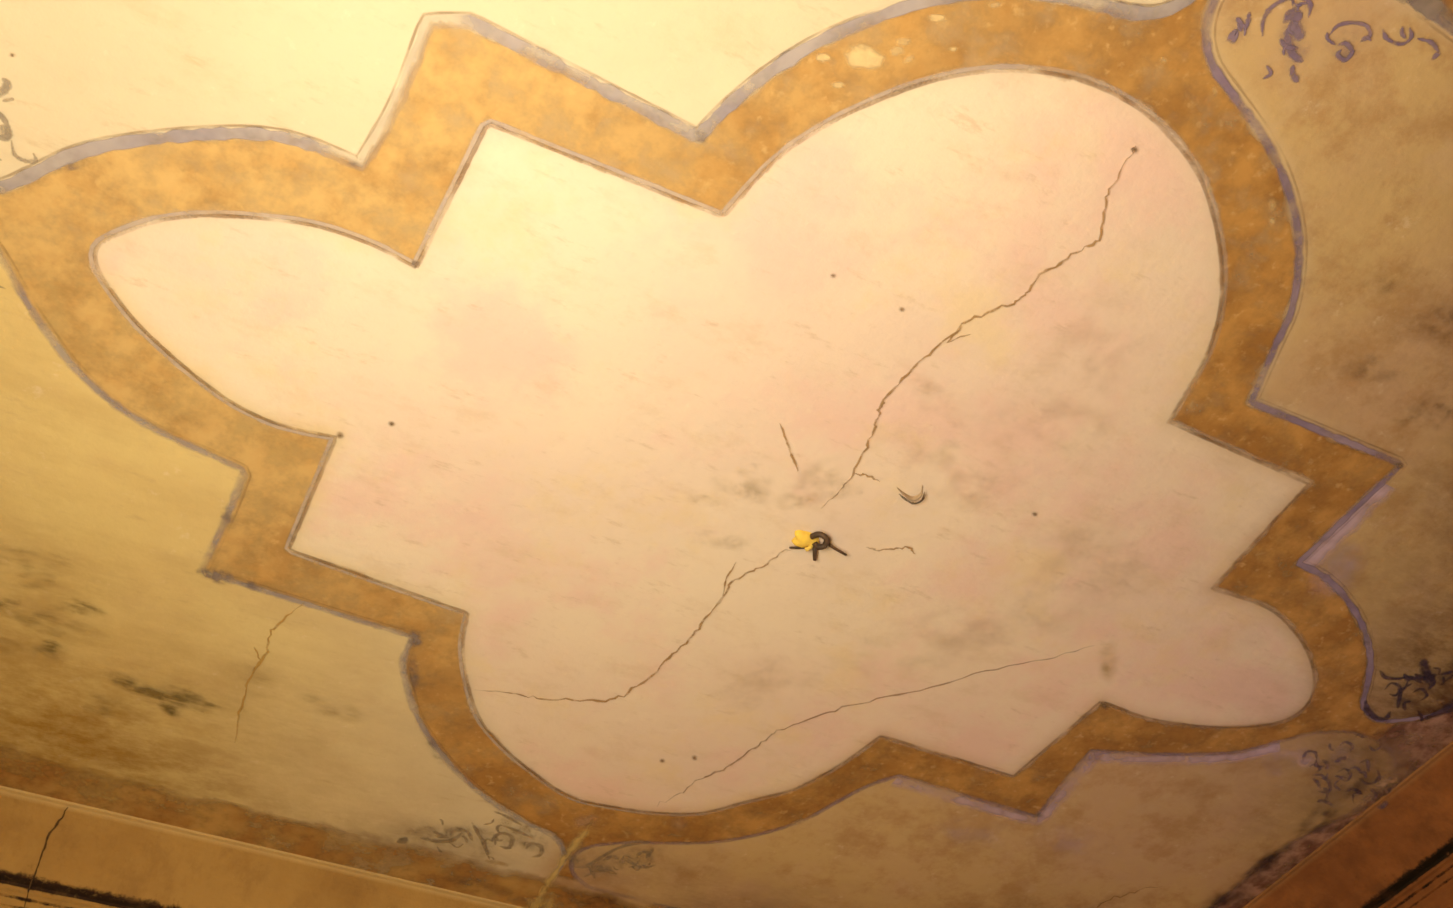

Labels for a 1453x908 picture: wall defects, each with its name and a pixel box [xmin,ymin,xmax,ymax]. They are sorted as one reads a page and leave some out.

crack [832,147,1134,499]
crack [780,424,798,471]
damp [120,680,189,715]
crack [237,614,290,715]
crack [504,551,783,702]
crack [677,657,1056,795]